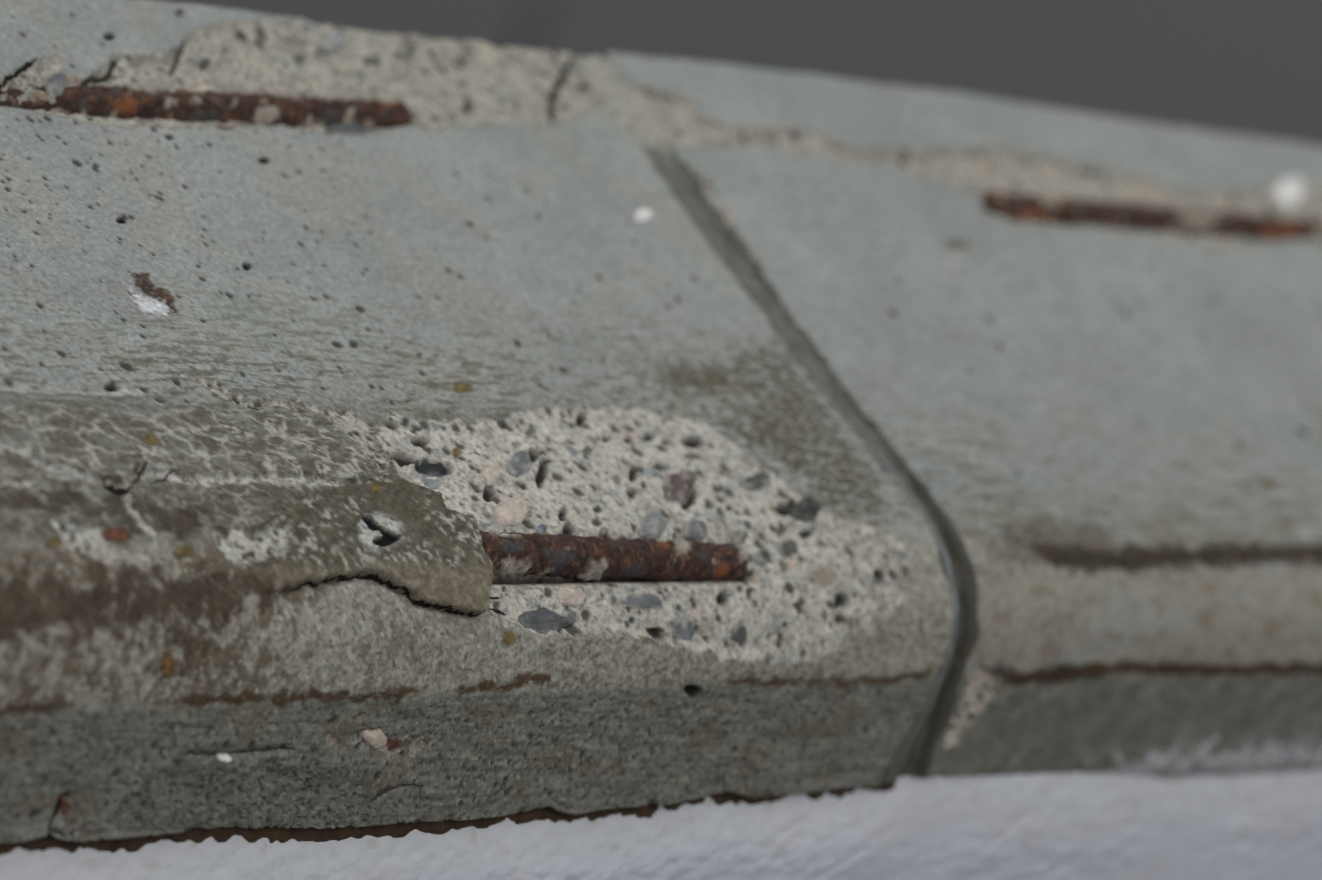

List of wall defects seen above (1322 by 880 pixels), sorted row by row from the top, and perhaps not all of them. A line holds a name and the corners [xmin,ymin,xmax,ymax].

spalling [0,16,604,141]
spalling [627,83,1322,248]
rust [130,272,178,316]
spalling [192,376,912,668]
crack [47,793,71,836]
crack [371,783,423,801]